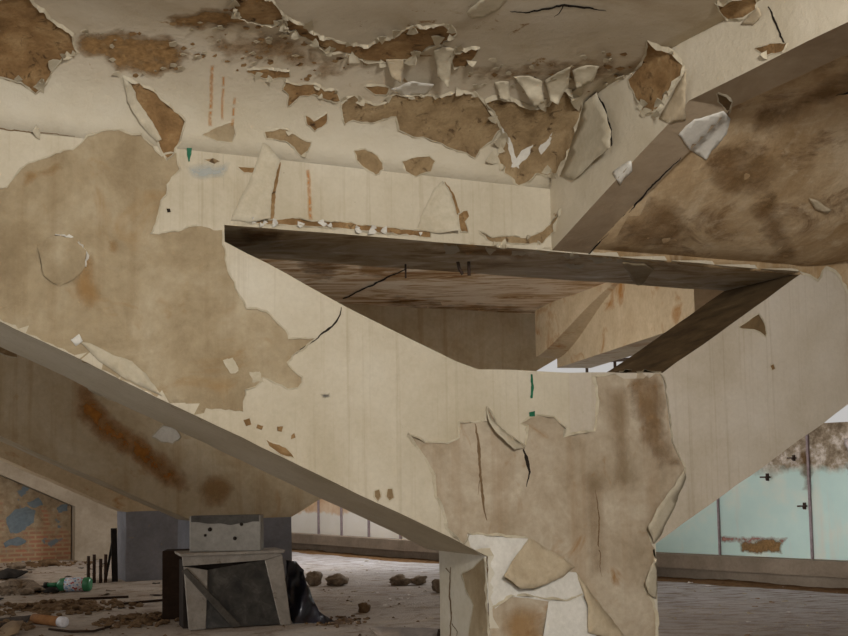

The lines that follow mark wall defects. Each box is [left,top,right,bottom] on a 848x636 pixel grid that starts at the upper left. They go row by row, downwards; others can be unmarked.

crack [510,4,605,15]
crack [0,128,75,137]
crack [296,269,405,354]
peeling [0,0,733,459]
peeling [592,249,848,295]
spalling [738,313,767,338]
corrosion [81,393,179,483]
crack [475,424,487,520]
crack [523,449,531,487]
peeling [407,369,686,636]